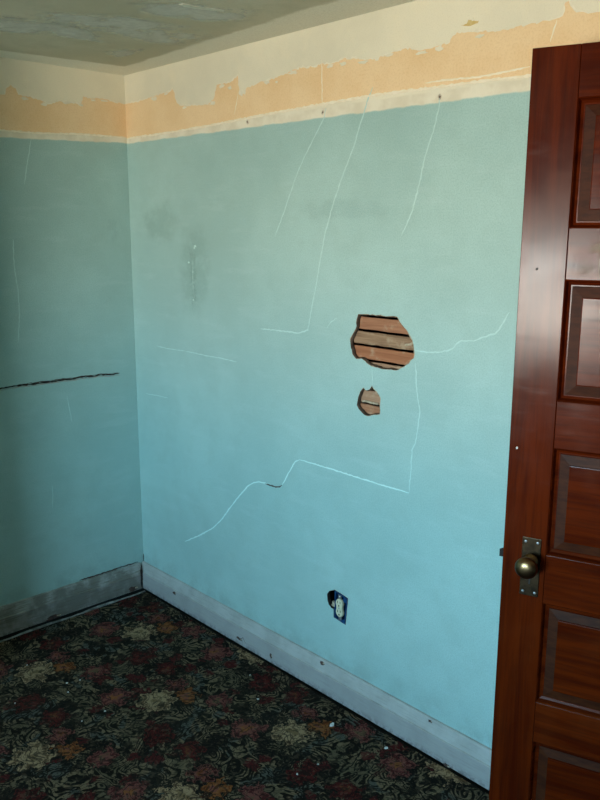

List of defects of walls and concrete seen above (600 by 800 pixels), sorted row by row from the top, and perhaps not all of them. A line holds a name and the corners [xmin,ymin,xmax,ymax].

peeling [0,1,600,138]
crack [260,90,372,334]
crack [400,66,530,238]
crack [0,372,120,421]
crack [185,313,509,542]
spalling [357,386,381,416]
spalling [350,314,415,370]